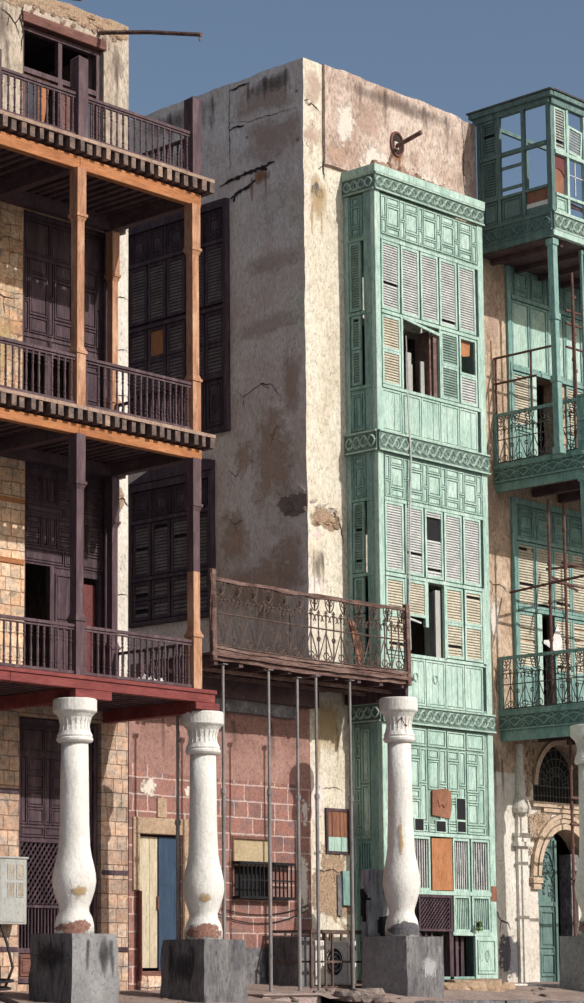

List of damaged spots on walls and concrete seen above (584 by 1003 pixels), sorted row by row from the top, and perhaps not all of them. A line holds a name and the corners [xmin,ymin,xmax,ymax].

crack [220,83,319,202]
spalling [275,485,344,542]
flaking render [140,778,157,797]
peeling [54,919,93,934]
peeling [184,923,222,939]